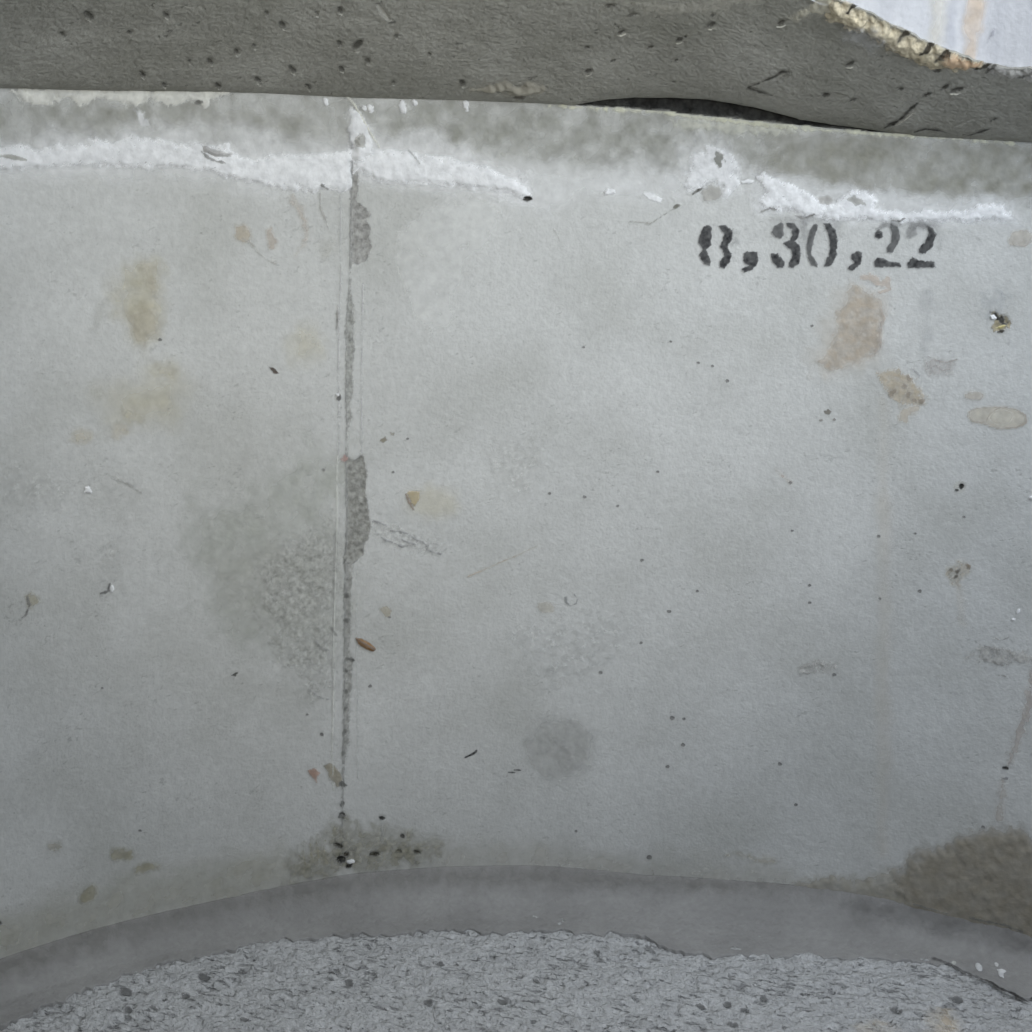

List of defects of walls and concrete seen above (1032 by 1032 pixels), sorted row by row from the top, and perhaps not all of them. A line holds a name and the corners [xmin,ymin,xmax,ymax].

spalling [825,0,1032,82]
leakage [0,89,1032,224]
leakage [819,275,891,370]
crack [309,144,372,865]